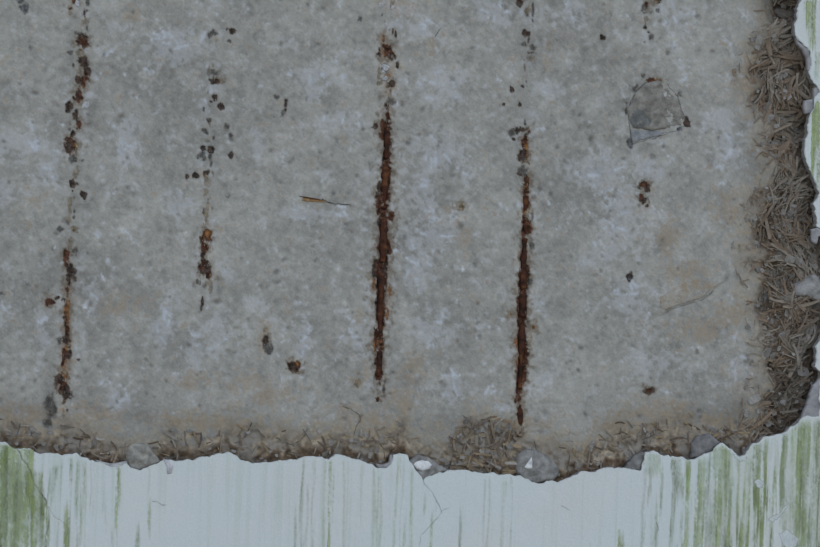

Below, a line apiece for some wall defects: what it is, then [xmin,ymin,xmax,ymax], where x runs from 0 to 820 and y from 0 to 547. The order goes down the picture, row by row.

corrosion [64,0,91,162]
spalling [625,75,690,148]
peeling [794,39,811,71]
water stain [811,102,820,174]
corrosion [372,28,399,402]
corrosion [509,122,535,437]
peeling [810,228,820,244]
corrosion [44,244,80,426]
peeling [799,377,820,418]
water stain [0,446,49,547]
water stain [678,467,705,547]
water stain [715,446,772,547]